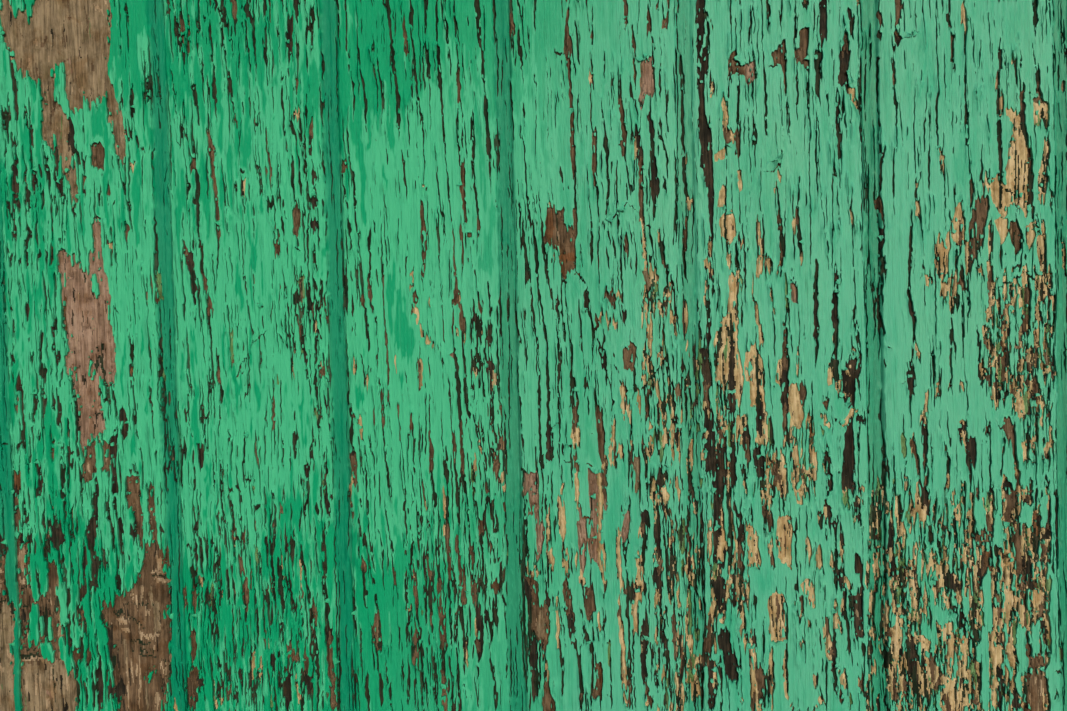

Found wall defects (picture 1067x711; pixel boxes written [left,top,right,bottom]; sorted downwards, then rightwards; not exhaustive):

peeling [0,0,131,209]
peeling [638,52,655,110]
peeling [709,15,755,133]
peeling [769,17,821,119]
peeling [0,519,80,711]
peeling [58,216,130,501]
peeling [99,464,173,711]
peeling [540,202,580,316]
peeling [521,339,675,711]
peeling [663,160,844,711]
peeling [820,352,860,515]
peeling [924,82,1055,382]